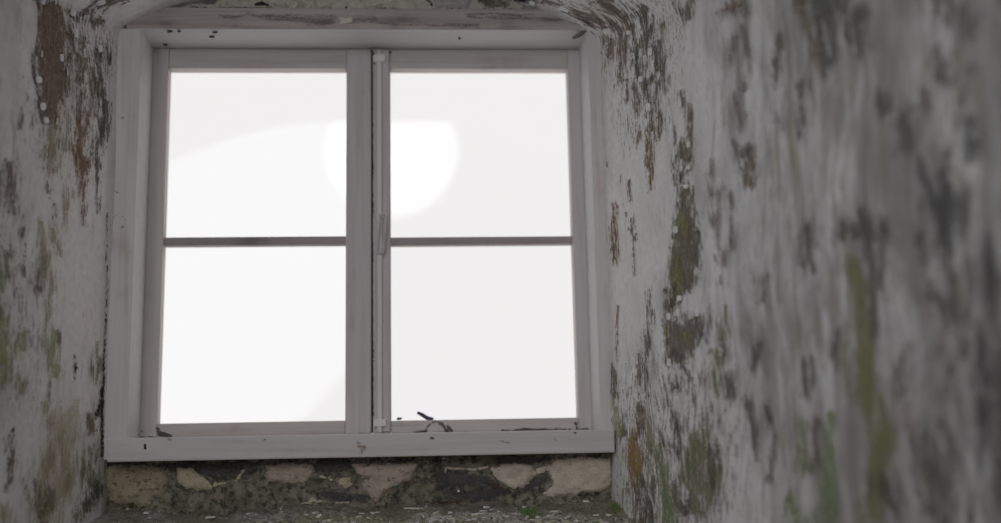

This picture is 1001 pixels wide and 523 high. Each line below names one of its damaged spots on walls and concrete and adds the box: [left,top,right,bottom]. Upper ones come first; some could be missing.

peeling [23,0,130,182]
flaking render [478,0,662,106]
water stain [0,158,19,215]
water stain [21,180,75,353]
peeling [619,174,638,274]
flaking render [661,90,705,382]
water stain [738,143,759,192]
water stain [797,218,816,275]
water stain [0,380,87,523]
water stain [620,288,721,523]
water stain [721,341,777,482]
water stain [798,354,815,400]